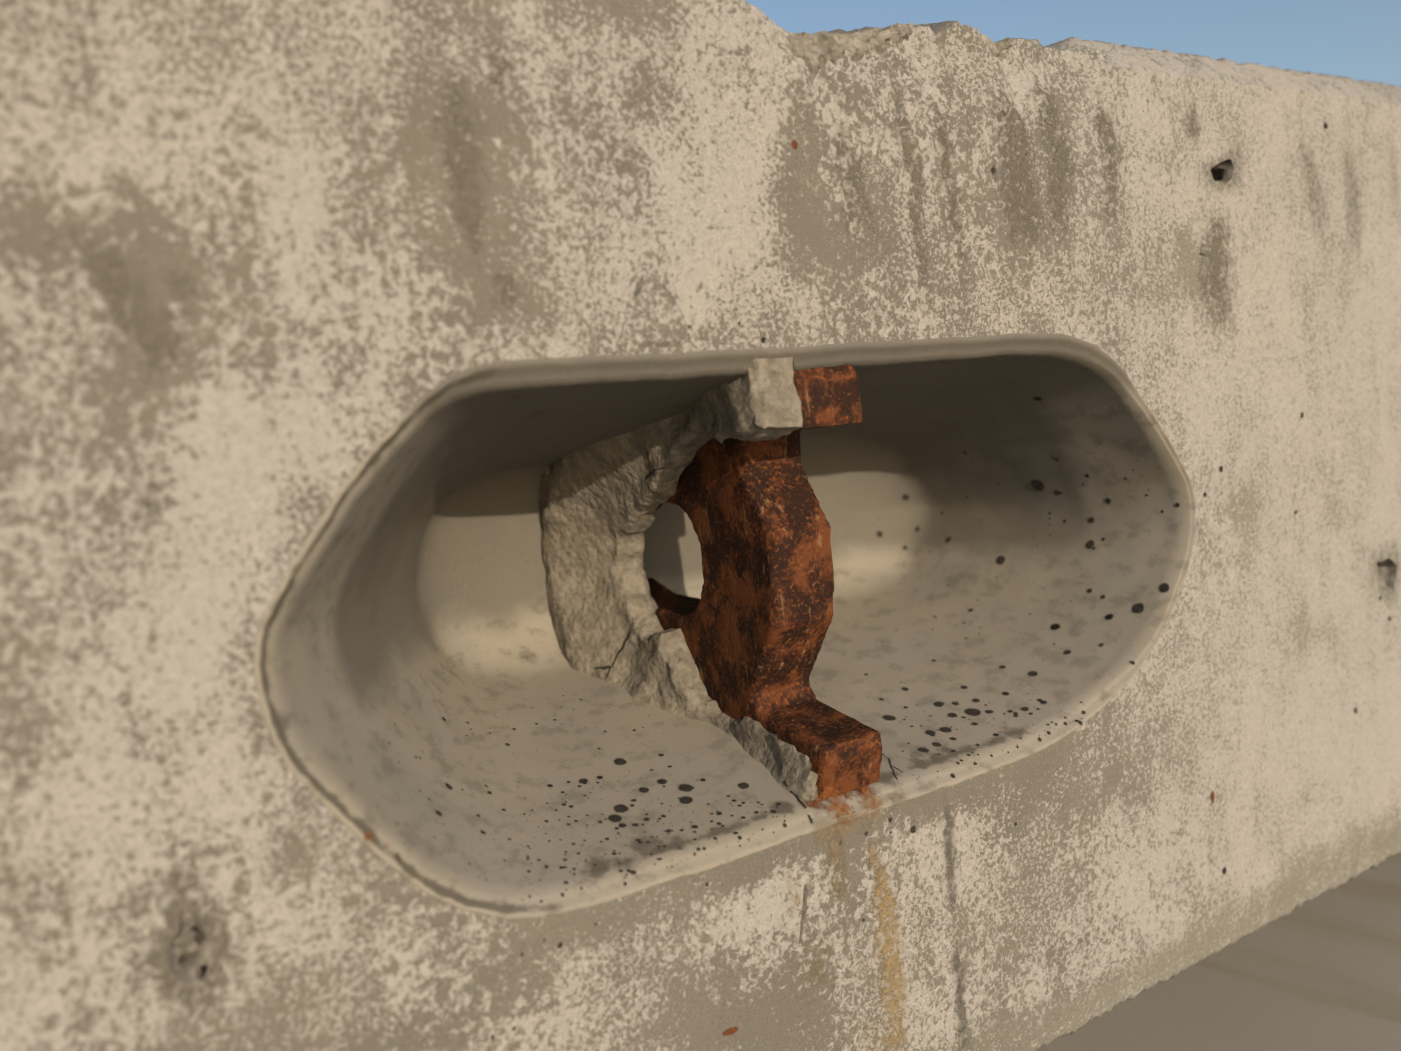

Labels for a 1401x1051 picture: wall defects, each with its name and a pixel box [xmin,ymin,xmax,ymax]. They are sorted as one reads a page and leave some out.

spalling [782,23,1063,91]
spalling [485,754,787,903]
corrosion [802,783,881,897]
corrosion [870,849,905,1047]